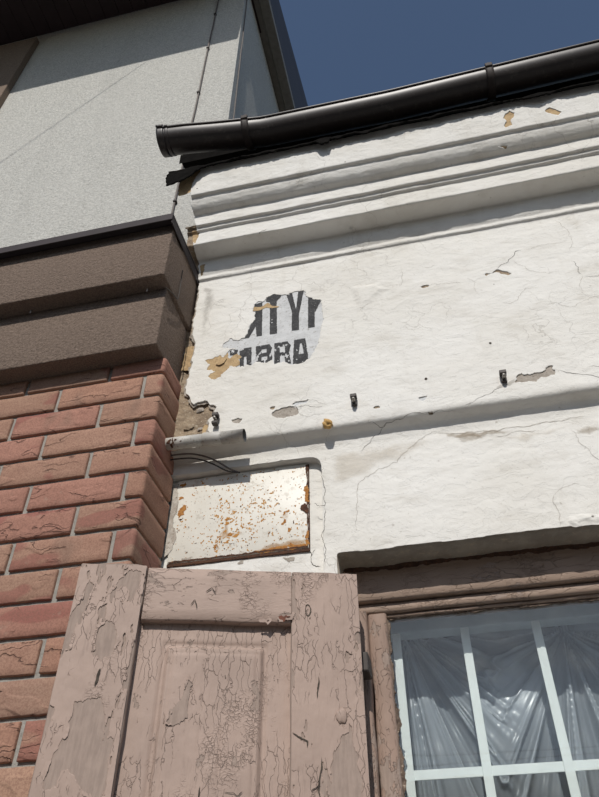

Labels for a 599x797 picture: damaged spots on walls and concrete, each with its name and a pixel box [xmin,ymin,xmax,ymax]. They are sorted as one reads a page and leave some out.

spalling [178,170,200,196]
spalling [174,225,216,437]
peeling [206,291,324,380]
peeling [515,366,597,383]
peeling [270,400,322,418]
crack [349,388,596,540]
rust [168,464,310,564]
peeling [91,618,120,660]
peeling [259,614,294,624]